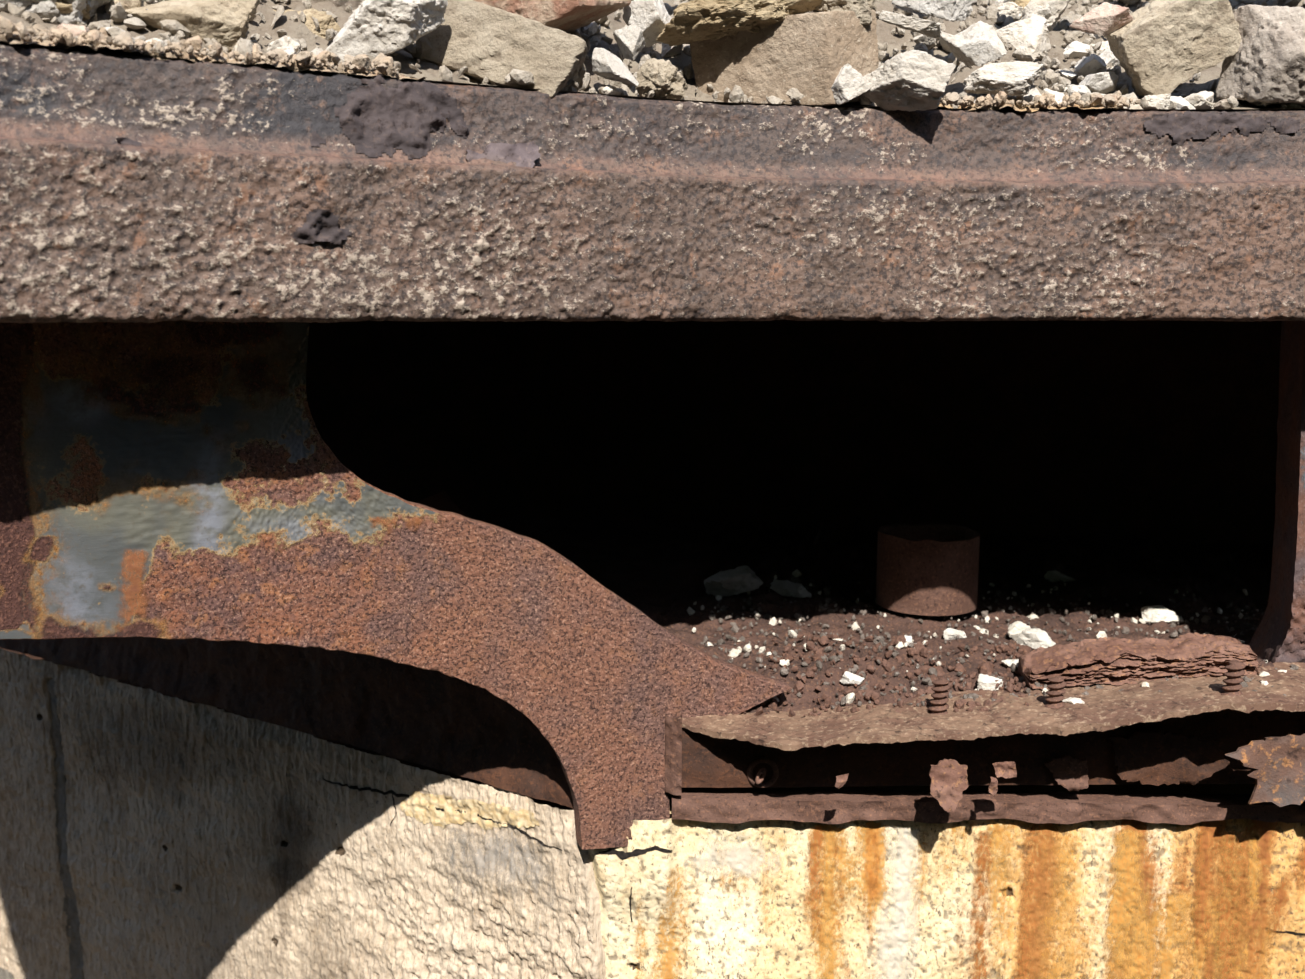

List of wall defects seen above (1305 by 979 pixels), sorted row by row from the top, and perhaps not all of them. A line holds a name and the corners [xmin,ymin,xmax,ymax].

rust [116,137,141,146]
rust [465,141,541,168]
rust [69,321,299,444]
rust [0,323,164,639]
crack [323,778,562,851]
rust [635,869,689,979]
rust [835,773,849,789]
rust [805,821,888,979]
rust [919,759,1083,979]
rust [1044,754,1089,792]
rust [1106,730,1305,979]